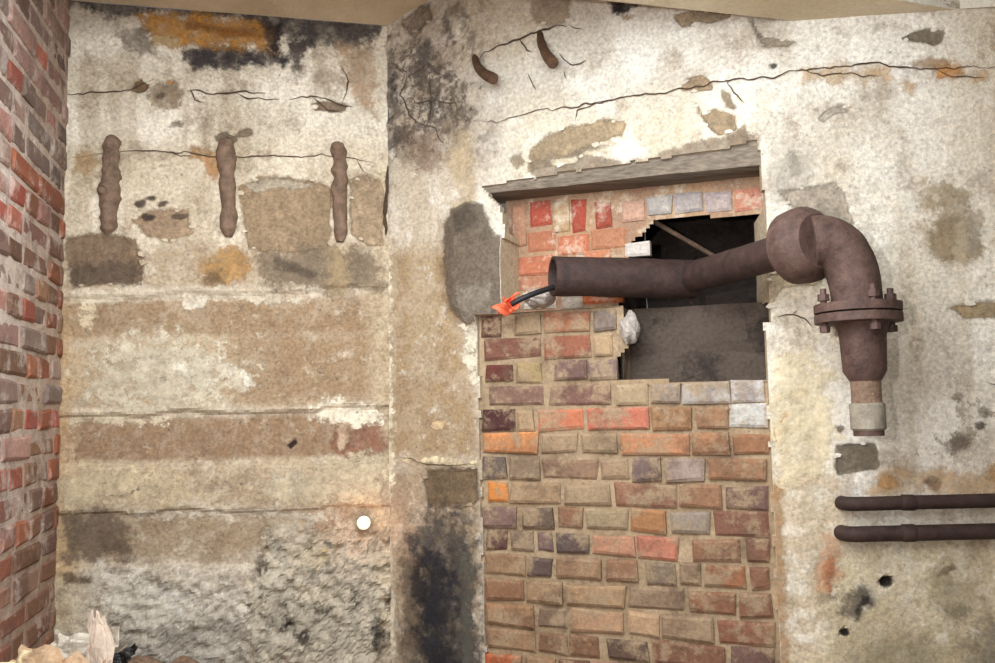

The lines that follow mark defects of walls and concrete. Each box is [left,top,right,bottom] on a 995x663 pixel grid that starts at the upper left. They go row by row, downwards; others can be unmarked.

corrosion [72,134,122,233]
crack [69,78,156,95]
spalling [64,196,197,287]
corrosion [189,137,251,285]
leakage [70,0,382,71]
crack [190,68,352,113]
spalling [236,176,334,253]
corrosion [330,141,348,243]
leakage [386,35,484,207]
spalling [511,119,626,171]
crack [394,24,995,145]
leakage [57,241,480,663]